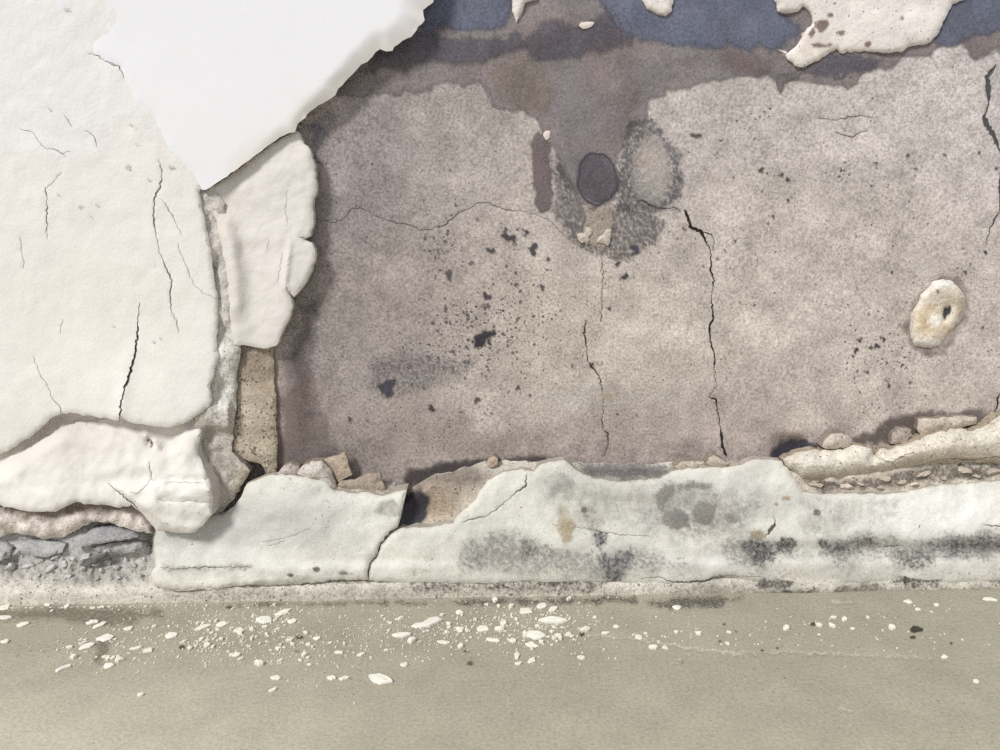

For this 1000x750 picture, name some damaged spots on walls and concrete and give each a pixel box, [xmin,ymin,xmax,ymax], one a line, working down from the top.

crack [20,129,70,234]
crack [119,303,140,421]
crack [152,160,215,332]
crack [284,198,609,457]
flaking render [0,0,1000,591]
leakage [336,0,1000,280]
crack [639,200,727,457]
crack [982,64,1000,151]
crack [986,179,1000,244]
crack [464,474,527,522]
leakage [653,481,799,567]
leakage [818,531,1000,588]